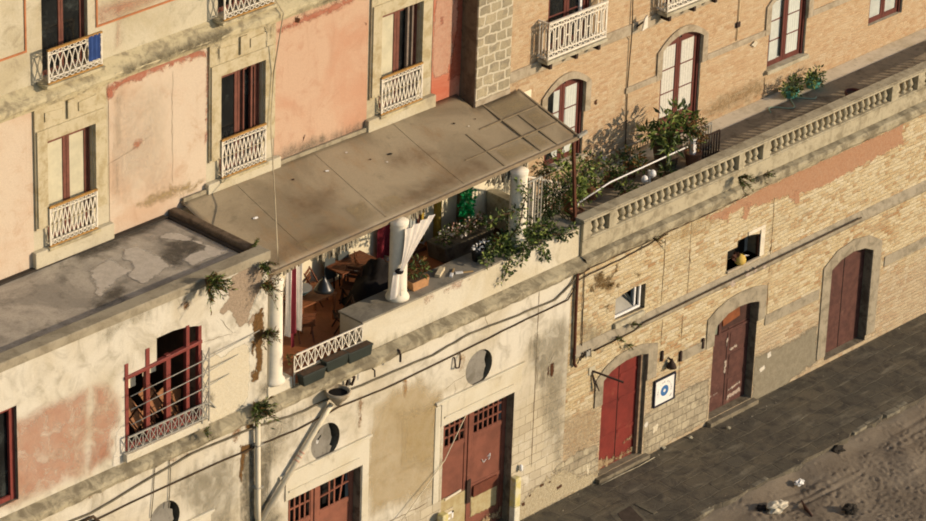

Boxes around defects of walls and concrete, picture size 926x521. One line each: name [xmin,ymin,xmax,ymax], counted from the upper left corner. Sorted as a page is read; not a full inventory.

peeling [448,0,463,81]
flaking render [706,124,904,223]
water stain [77,216,228,306]
spalling [220,266,265,382]
peeling [441,486,502,521]